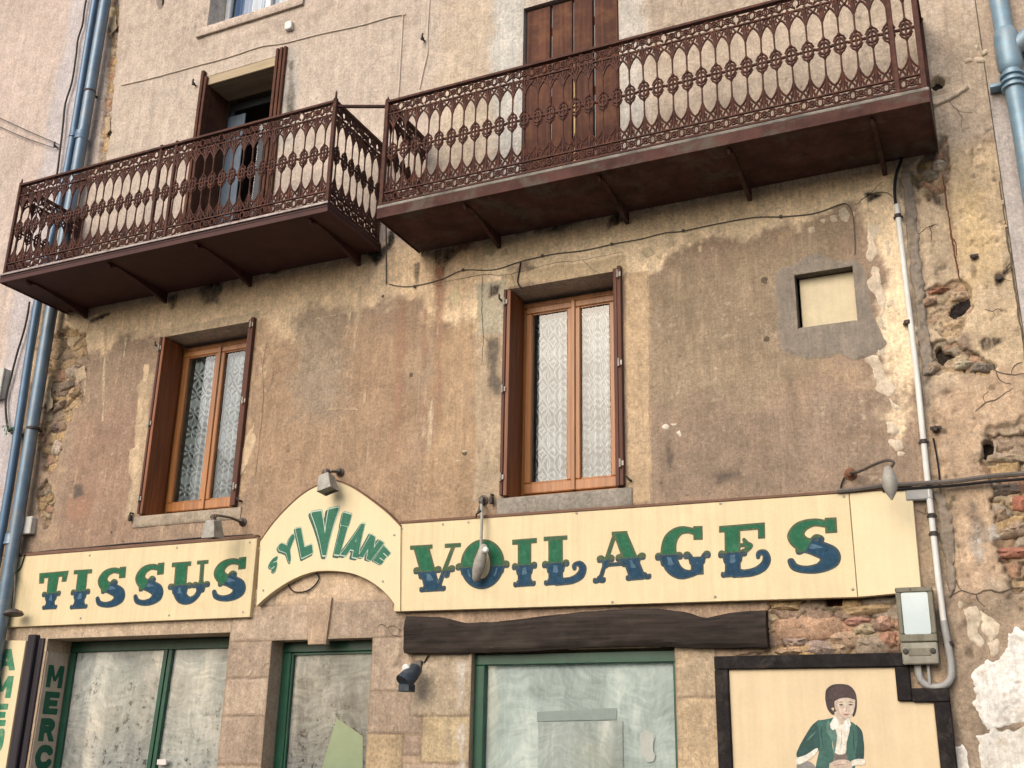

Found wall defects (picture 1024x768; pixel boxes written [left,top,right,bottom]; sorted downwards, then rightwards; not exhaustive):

flaking render [915,138,950,202]
flaking render [37,329,90,529]
leakage [488,339,499,394]
peeling [866,222,893,331]
peeling [864,347,900,410]
crack [918,175,960,280]
flaking render [923,281,995,377]
crack [975,181,1024,412]
flaking render [980,432,1024,594]
flaking render [740,595,901,656]
peeling [955,601,1024,768]